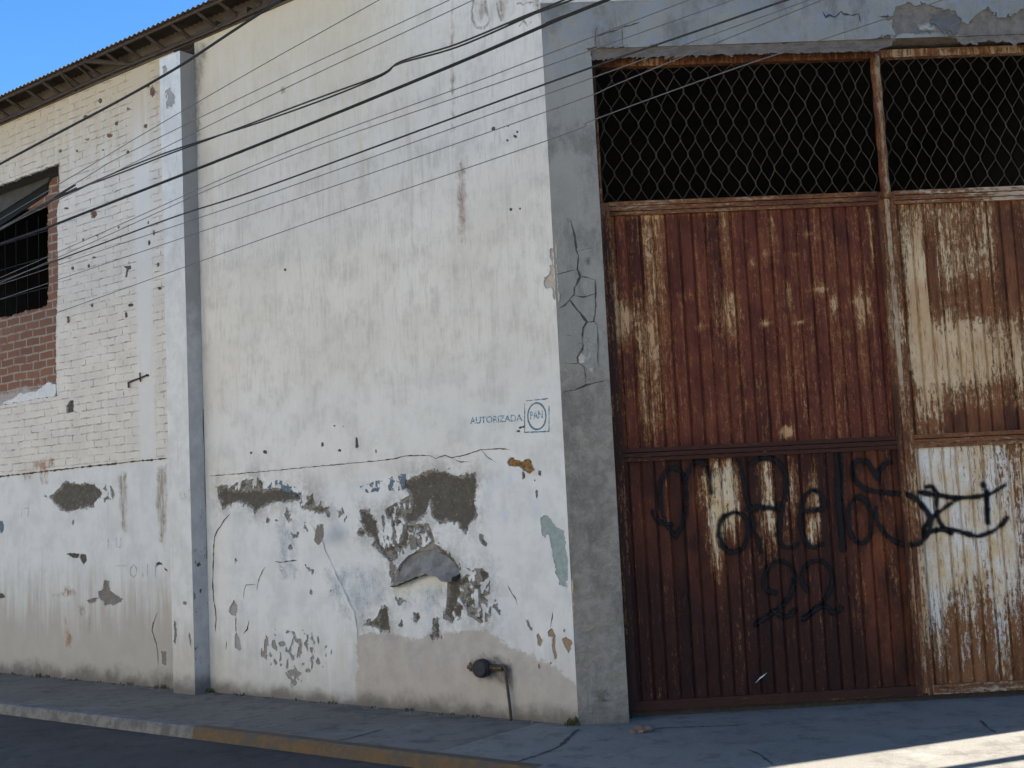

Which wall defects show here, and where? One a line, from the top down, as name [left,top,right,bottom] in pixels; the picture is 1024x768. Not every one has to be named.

spalling [588,2,1024,61]
peeling [545,243,560,302]
crack [555,222,605,393]
spalling [46,481,115,525]
spalling [218,479,346,550]
crack [203,409,509,646]
spalling [358,470,501,640]
spalling [88,580,123,605]
peeling [161,620,191,665]
peeling [261,630,332,686]